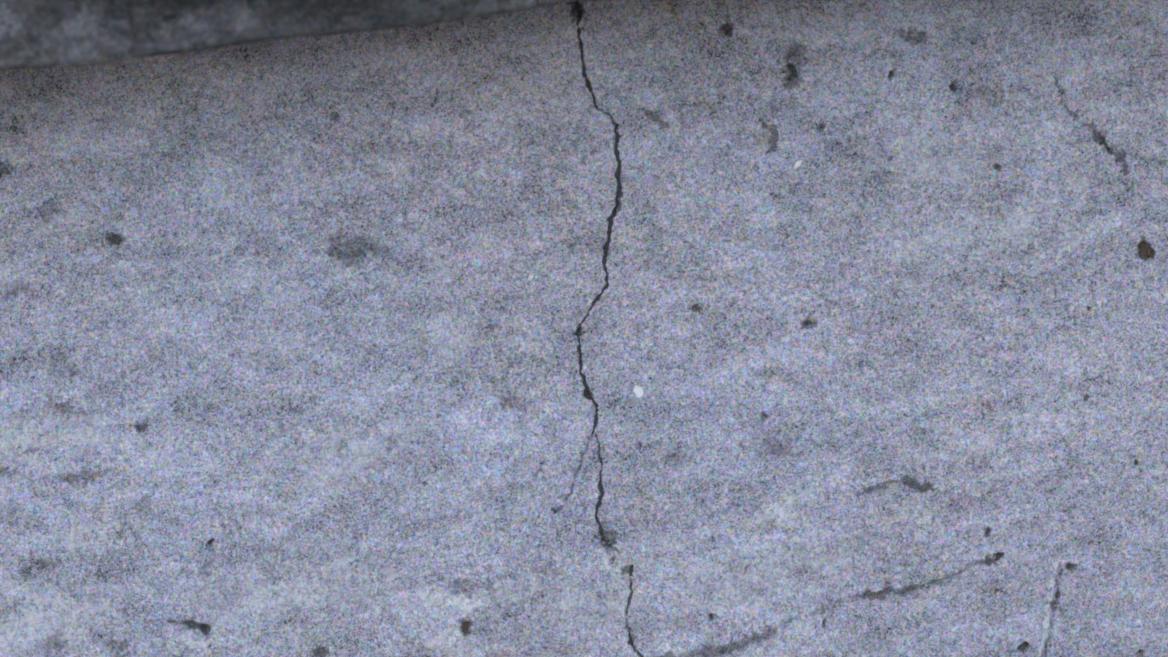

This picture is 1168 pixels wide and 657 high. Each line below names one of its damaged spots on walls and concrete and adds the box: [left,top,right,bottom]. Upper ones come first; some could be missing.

crack [568,0,644,657]